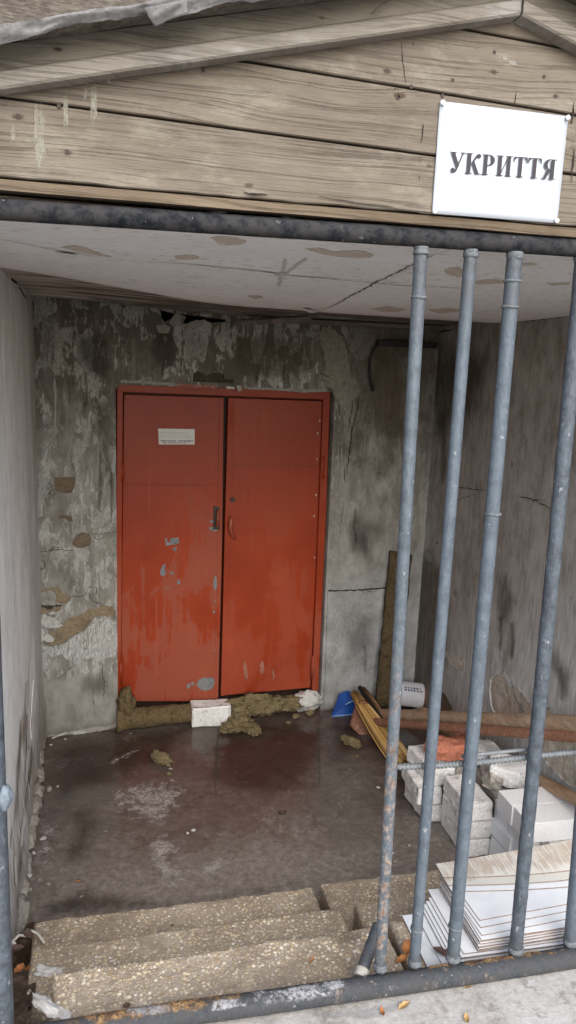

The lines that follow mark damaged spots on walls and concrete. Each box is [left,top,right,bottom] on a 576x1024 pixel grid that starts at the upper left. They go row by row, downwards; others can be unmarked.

crack [2,239,449,313]
spalling [156,310,226,333]
crack [339,399,360,483]
flaking render [50,464,76,494]
flaking render [59,514,112,549]
crack [328,585,386,593]
flaking render [41,586,117,668]
peeling [187,677,215,691]
leakage [115,783,181,886]